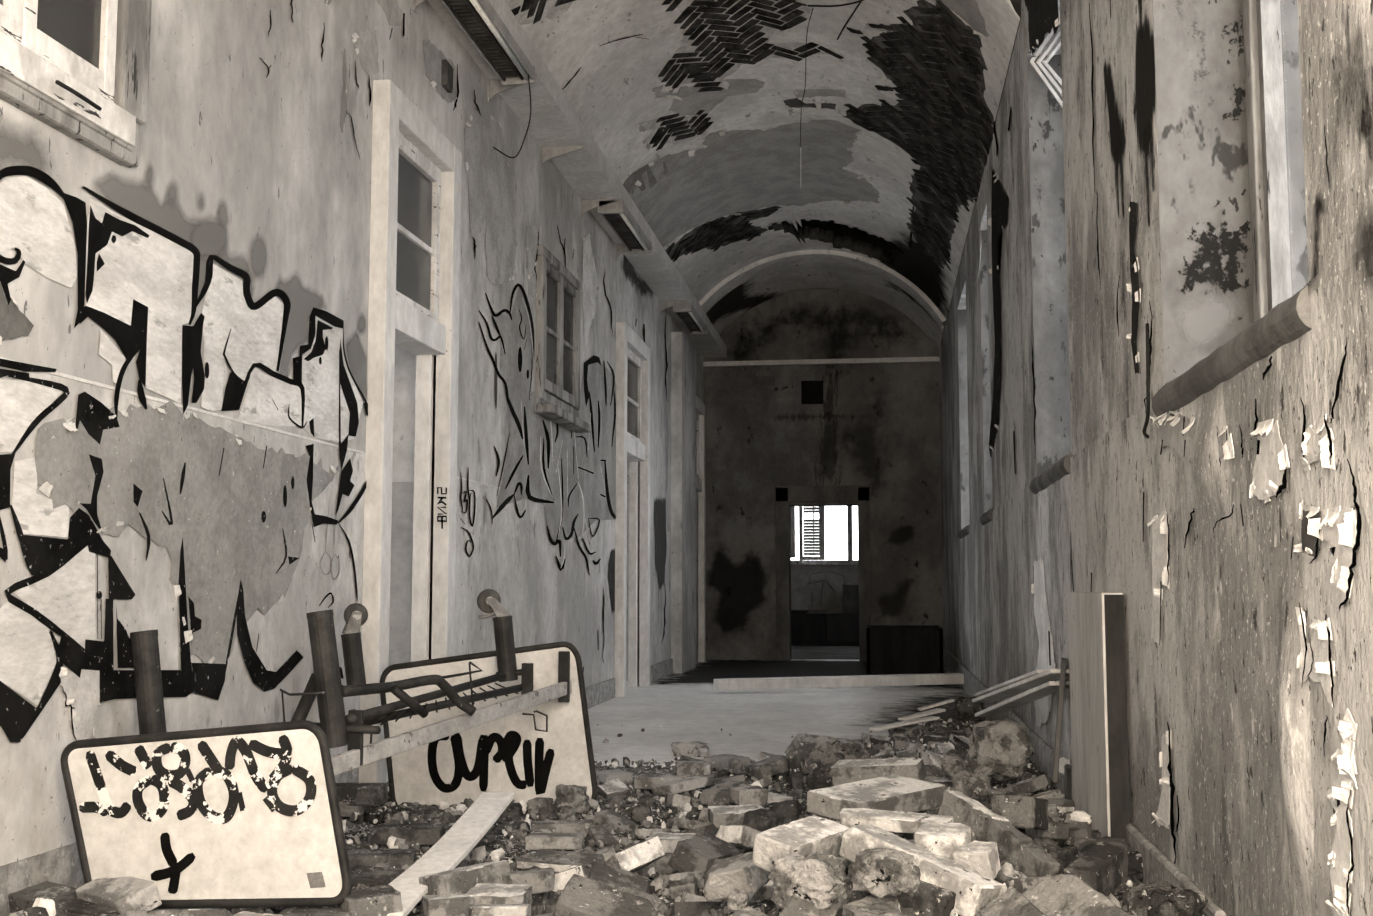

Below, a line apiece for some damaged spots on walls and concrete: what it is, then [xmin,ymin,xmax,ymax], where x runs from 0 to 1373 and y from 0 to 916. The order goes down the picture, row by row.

flaking render [505,0,577,25]
leakage [1345,50,1373,157]
flaking render [0,282,34,345]
flaking render [623,0,1009,457]
crack [1089,3,1362,757]
leakage [1358,219,1373,280]
peeling [1249,414,1335,504]
peeling [35,401,341,664]
leakage [708,551,767,632]
peeling [1148,510,1169,645]
peeling [1293,498,1358,916]
crack [1167,722,1179,864]